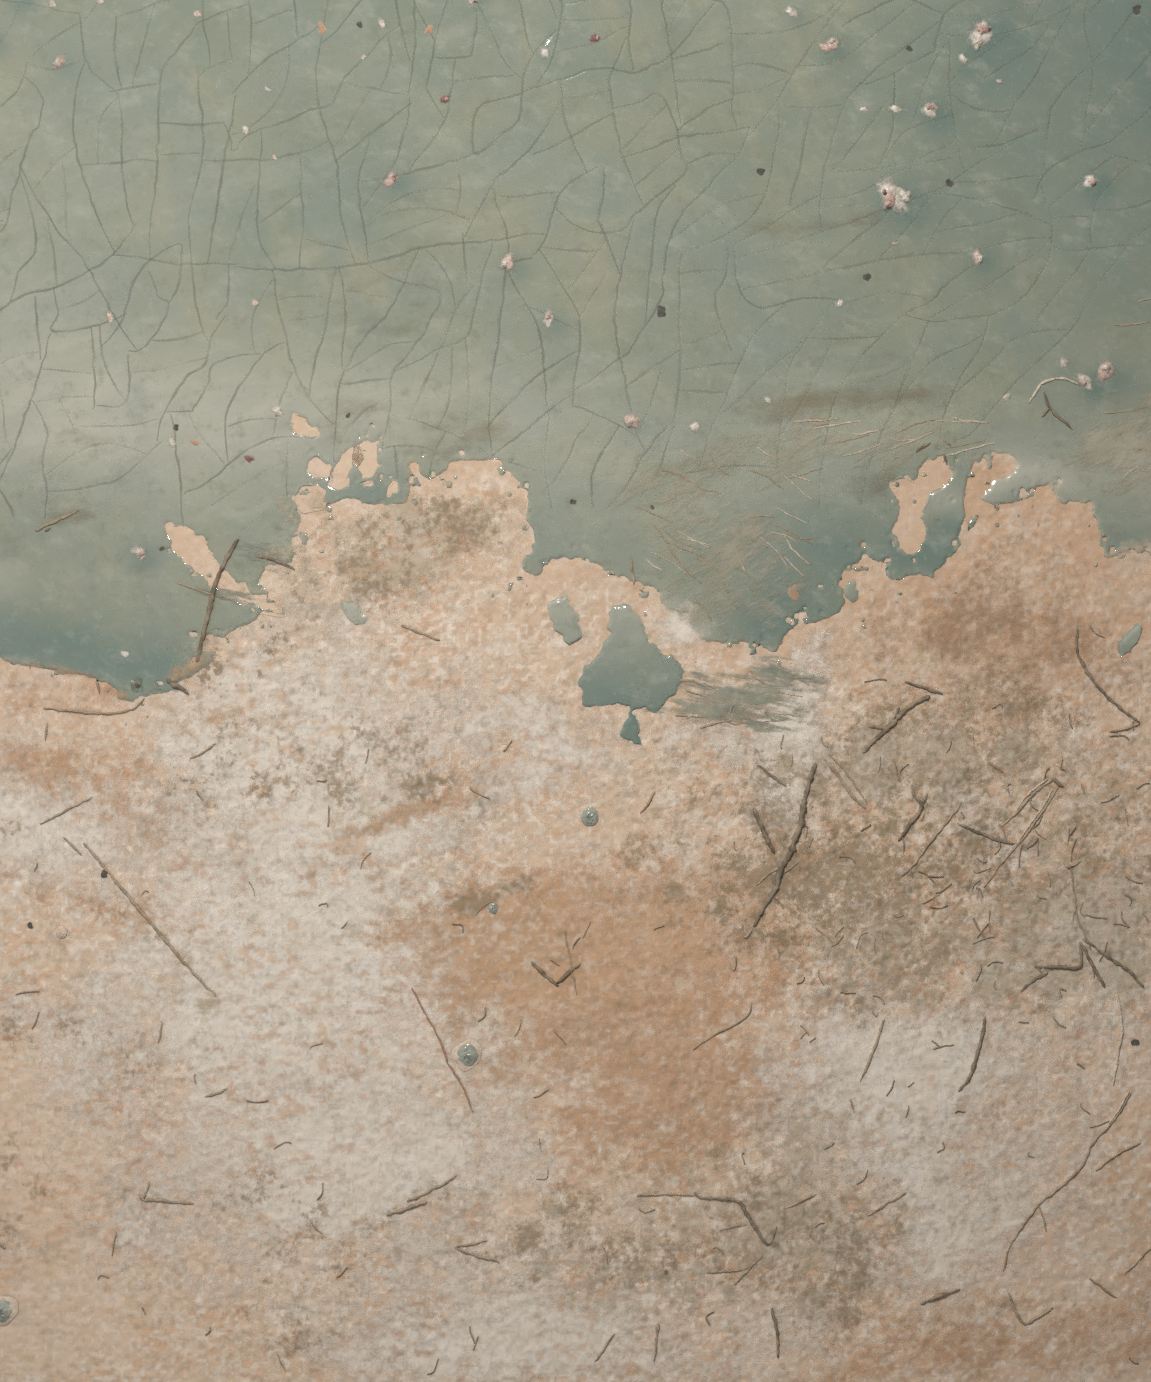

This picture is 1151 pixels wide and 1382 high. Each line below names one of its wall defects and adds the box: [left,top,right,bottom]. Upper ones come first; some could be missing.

peeling [0,406,1151,1382]